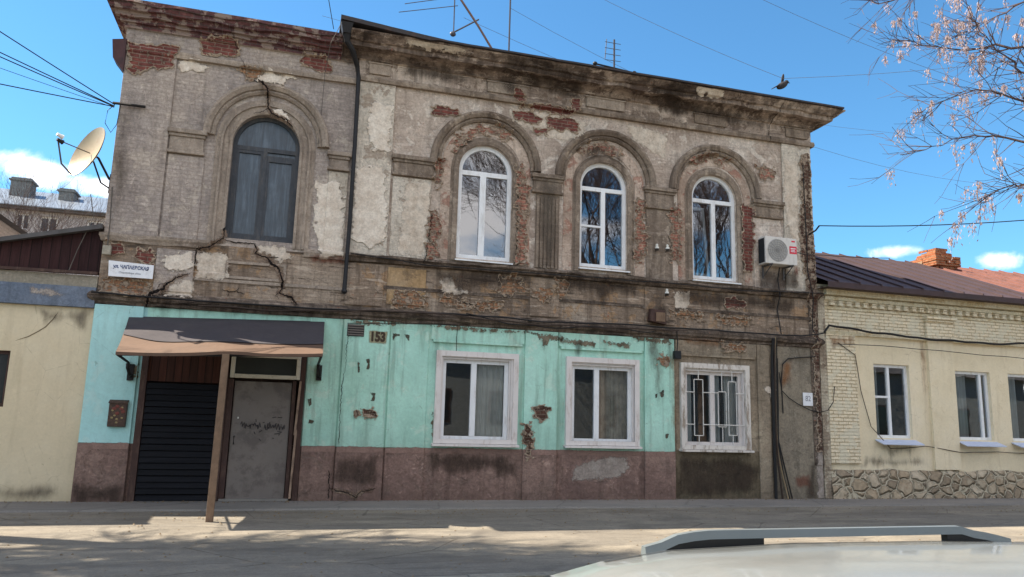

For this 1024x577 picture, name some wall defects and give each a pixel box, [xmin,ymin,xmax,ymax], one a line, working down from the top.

spalling [126,33,333,86]
crack [231,29,293,127]
leakage [505,56,586,95]
peeling [312,87,586,260]
peeling [99,237,229,298]
crack [144,228,297,307]
spalling [351,163,570,340]
peeling [430,325,672,368]
spalling [754,153,825,498]
peeling [353,393,378,420]
spalling [520,404,552,461]
leakage [433,456,513,473]